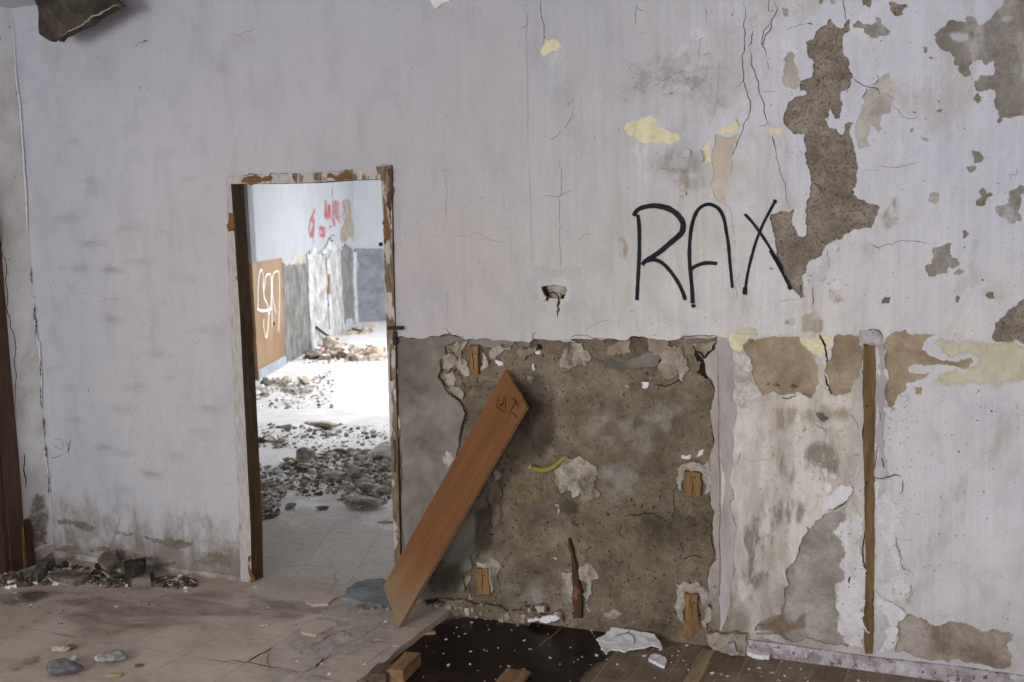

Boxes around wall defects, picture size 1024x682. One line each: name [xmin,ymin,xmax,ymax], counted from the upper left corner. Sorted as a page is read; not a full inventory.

flaking render [624,115,740,202]
crack [730,0,812,207]
flaking render [769,0,908,298]
peeling [923,0,1024,123]
spalling [542,285,567,306]
crack [529,164,631,341]
peeling [883,299,1024,408]
crack [212,631,353,678]
flaking render [393,328,863,646]
flaking render [755,468,1013,668]